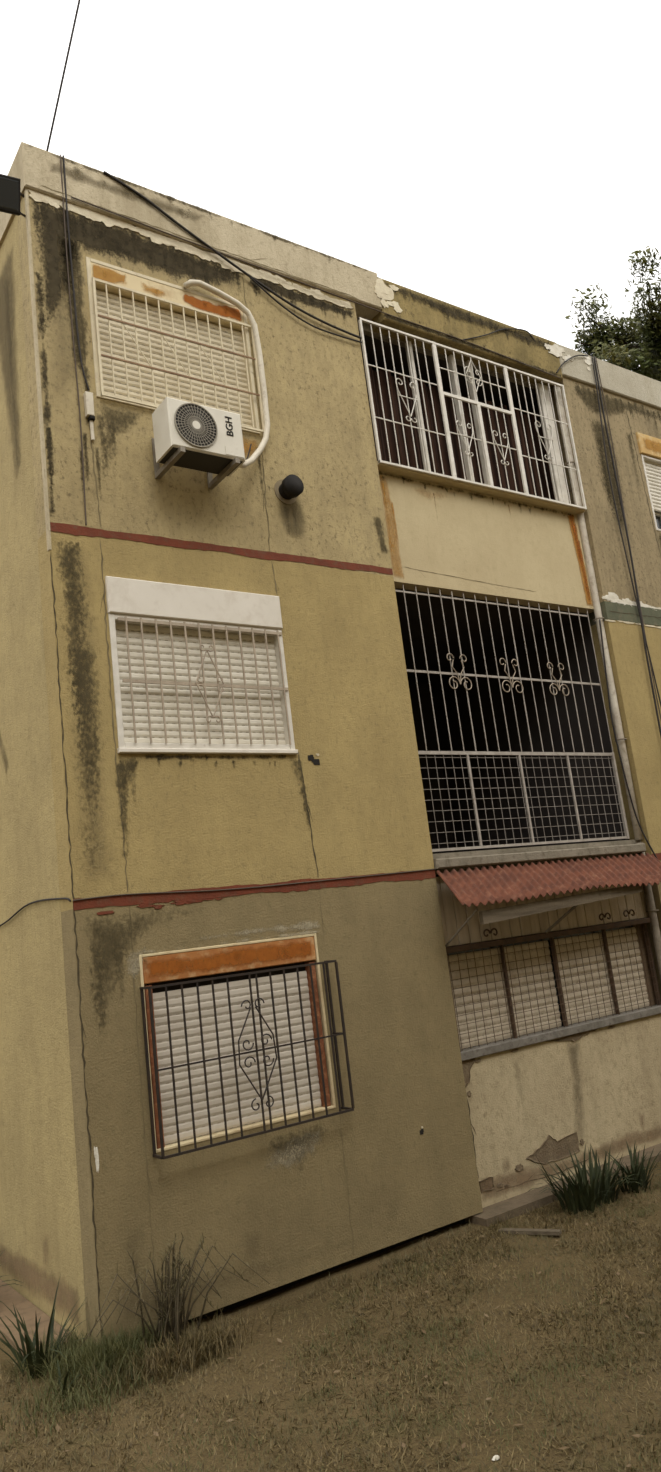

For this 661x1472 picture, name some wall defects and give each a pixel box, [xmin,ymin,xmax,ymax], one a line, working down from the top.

leakage [0,258,18,464]
leakage [33,202,352,512]
peeling [375,278,403,313]
leakage [575,385,661,522]
leakage [62,548,97,797]
flaking render [479,1132,585,1193]